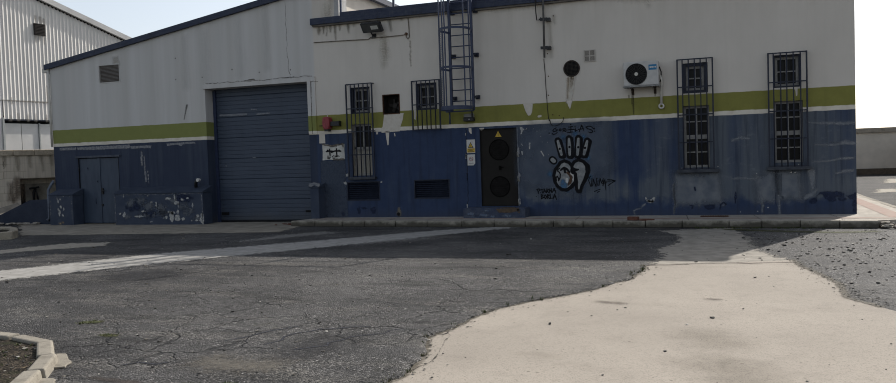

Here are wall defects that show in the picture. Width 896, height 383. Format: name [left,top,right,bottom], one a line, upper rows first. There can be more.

peeling [376,109,416,145]
peeling [119,193,204,224]